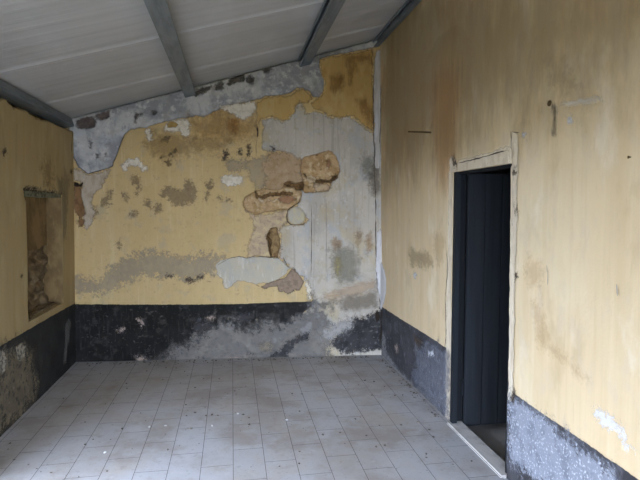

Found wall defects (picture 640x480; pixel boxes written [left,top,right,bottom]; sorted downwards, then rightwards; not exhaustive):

water stain [75,248,226,295]
peeling [69,41,616,480]
peeling [594,411,632,450]